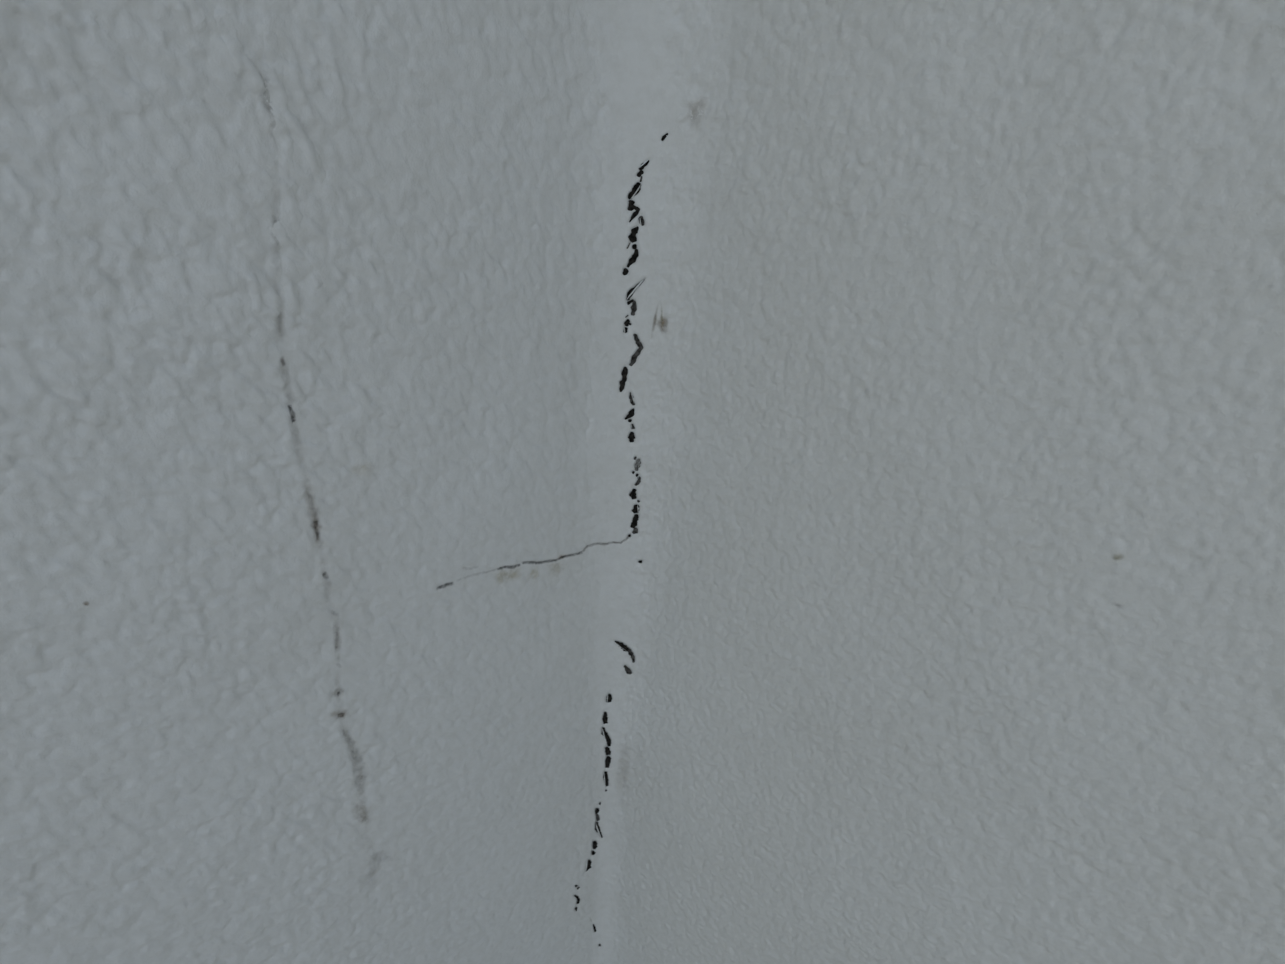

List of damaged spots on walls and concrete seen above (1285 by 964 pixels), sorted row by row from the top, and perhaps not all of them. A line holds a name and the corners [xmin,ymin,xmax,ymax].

crack [499,159,649,569]
crack [574,641,635,946]